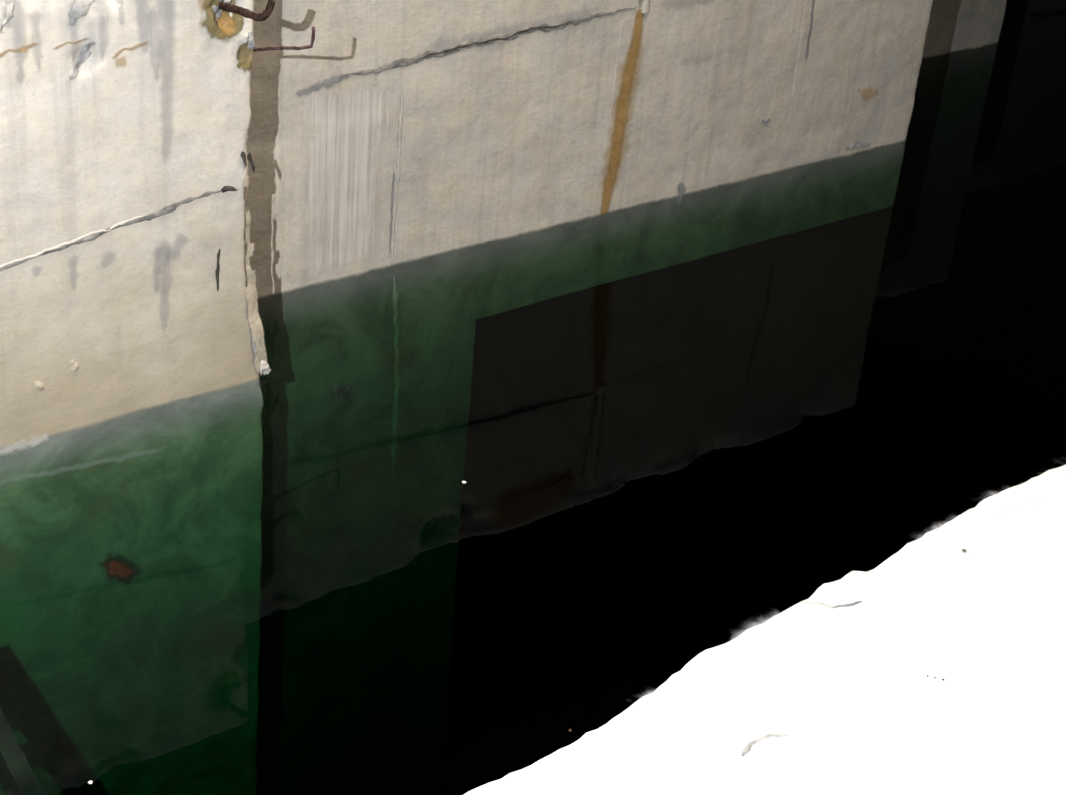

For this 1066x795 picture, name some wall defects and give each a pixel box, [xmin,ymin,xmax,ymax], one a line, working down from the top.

corrosion [200,0,255,72]
crack [297,6,638,95]
corrosion [601,9,643,214]
crack [0,186,237,271]
corrosion [100,555,140,584]